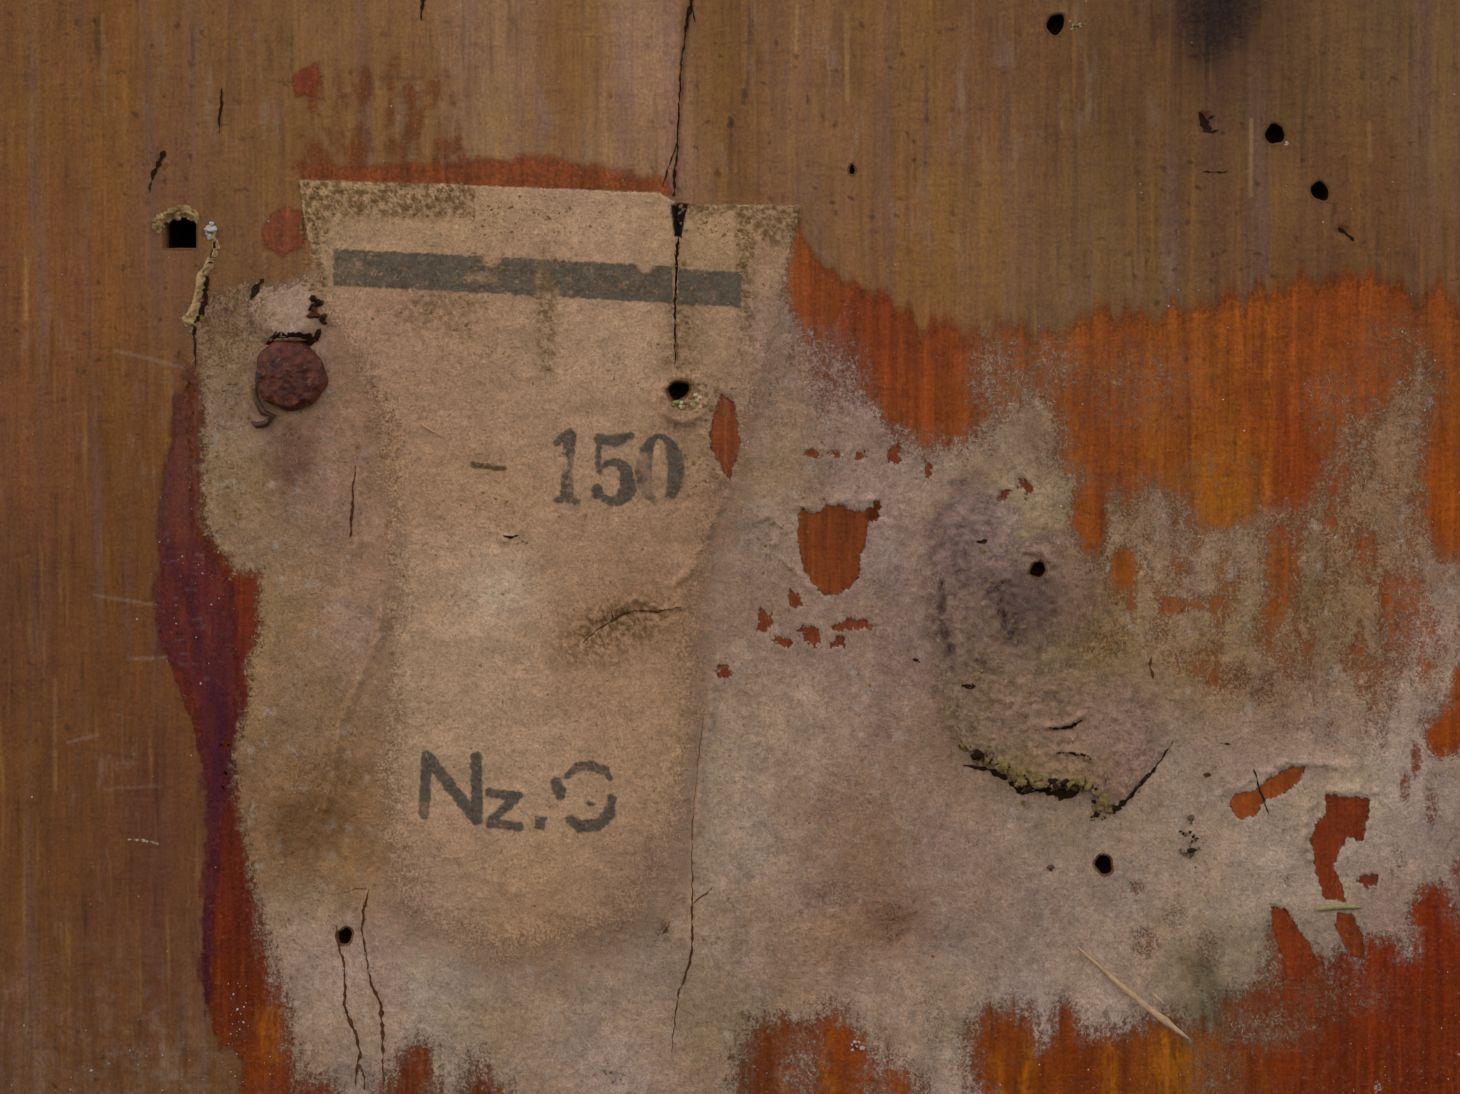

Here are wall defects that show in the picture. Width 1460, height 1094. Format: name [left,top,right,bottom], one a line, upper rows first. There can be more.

crack [662,0,696,197]
peeling [151,204,217,240]
peeling [306,295,327,325]
crack [672,236,680,364]
peeling [671,393,740,480]
peeling [996,478,1032,501]
peeling [788,501,881,609]
peeling [758,608,873,647]
peeling [1230,766,1304,819]
peeling [1310,795,1378,959]
peeling [1271,907,1317,983]
crack [336,888,385,1091]